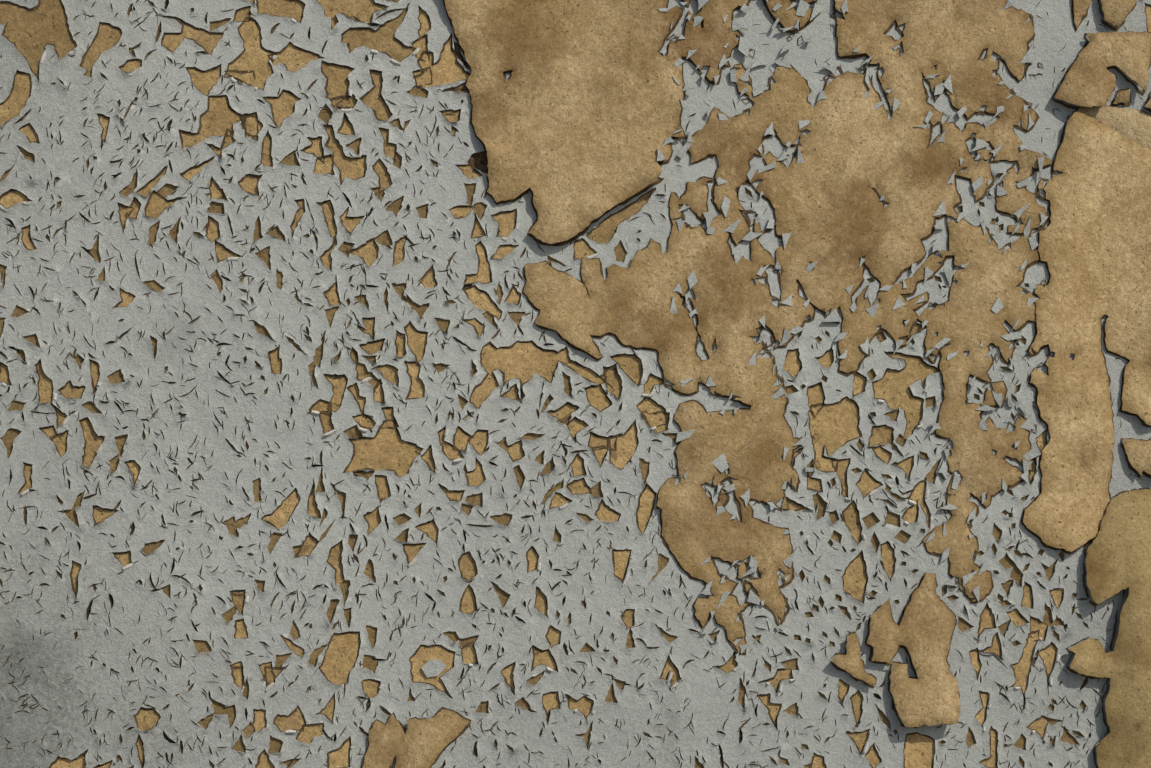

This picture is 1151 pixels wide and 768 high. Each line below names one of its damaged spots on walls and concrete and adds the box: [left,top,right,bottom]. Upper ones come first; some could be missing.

peeling [0,0,142,250]
peeling [117,161,181,248]
peeling [243,322,282,395]
peeling [285,0,1151,768]
peeling [59,489,119,527]
peeling [219,441,346,567]
peeling [112,540,165,571]
peeling [221,579,265,639]
peeling [49,707,161,768]
peeling [198,698,236,730]
peeling [230,661,249,700]
peeling [233,534,384,768]